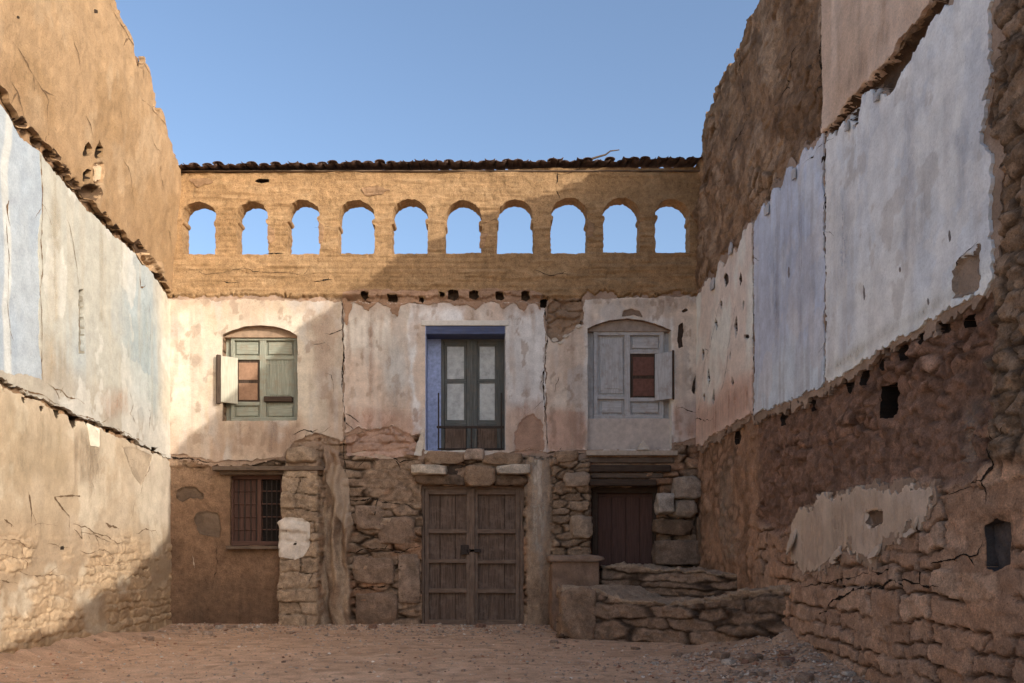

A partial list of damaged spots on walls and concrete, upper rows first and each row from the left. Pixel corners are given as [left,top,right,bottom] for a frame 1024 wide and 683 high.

crack [6,45,79,320]
spalling [10,116,120,236]
flaking render [952,243,981,299]
flaking render [342,288,584,345]
crack [535,310,584,454]
crack [1,359,213,583]
flaking render [284,426,424,475]
flaking render [514,414,545,455]
crack [948,426,1002,503]
flaking render [176,487,221,538]
flaking render [865,510,883,528]